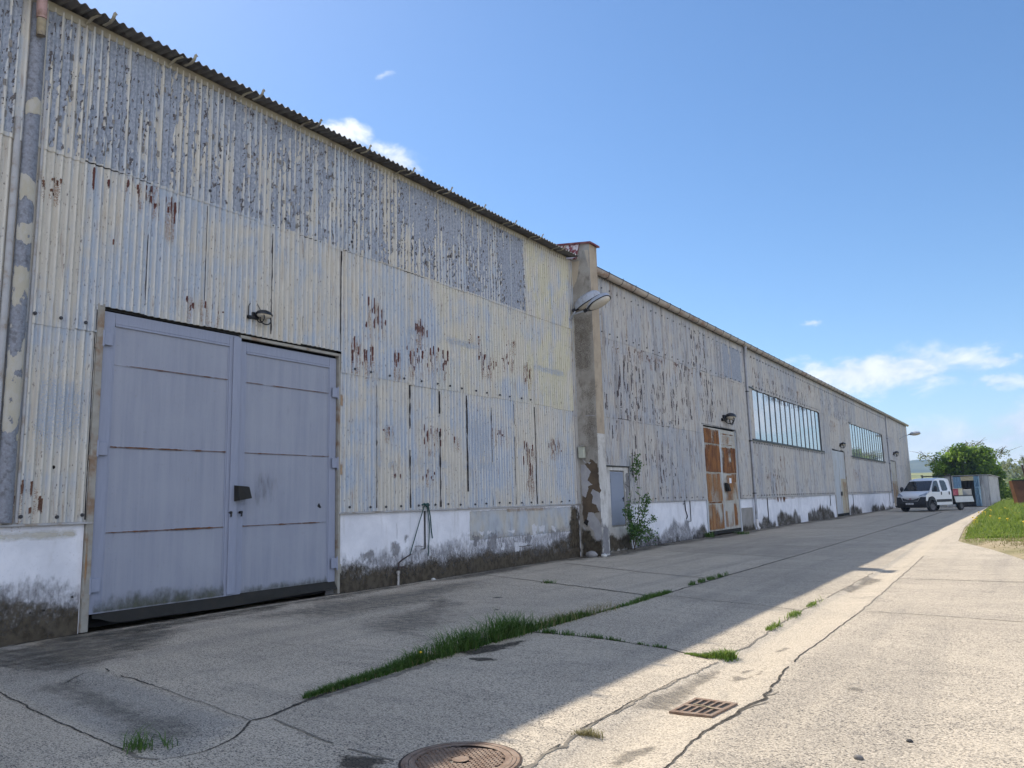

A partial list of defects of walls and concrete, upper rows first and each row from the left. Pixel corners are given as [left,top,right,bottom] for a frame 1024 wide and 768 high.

rust [41,177,62,207]
rust [124,178,177,243]
peeling [0,0,526,311]
rust [185,296,224,327]
rust [351,297,386,381]
rust [394,319,449,382]
rust [468,334,532,391]
peeling [470,459,603,552]
leakage [332,473,893,598]
rust [703,428,739,531]
leakage [0,585,280,667]
crack [520,556,923,768]